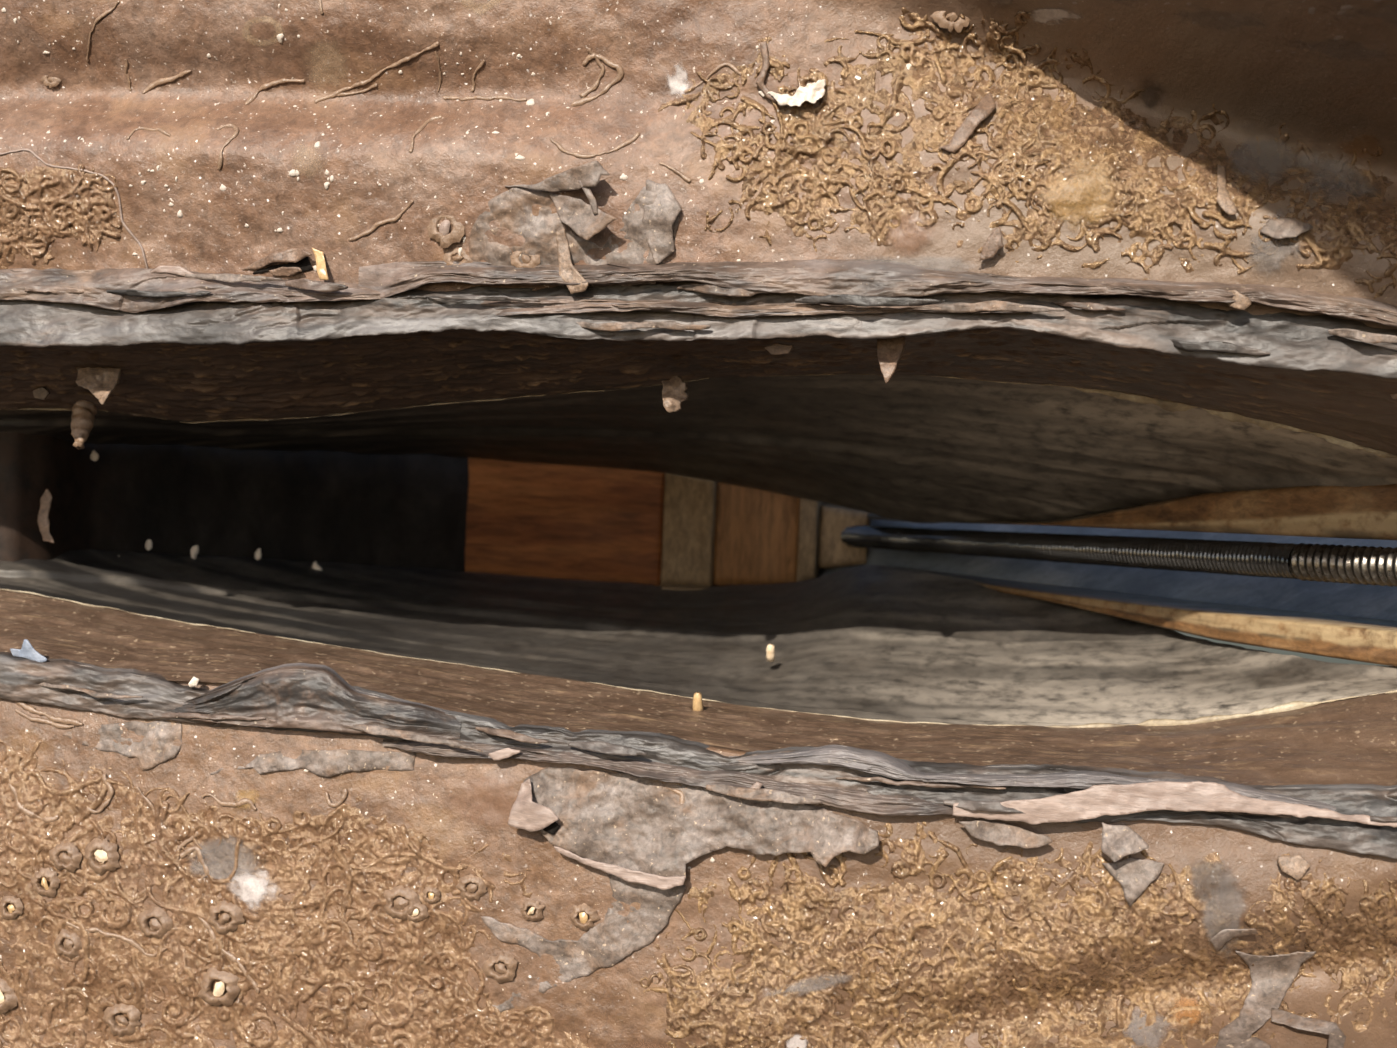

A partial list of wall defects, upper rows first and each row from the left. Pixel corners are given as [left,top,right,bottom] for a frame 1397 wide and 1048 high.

peeling [469,161,682,294]
peeling [480,767,879,994]
peeling [1210,929,1346,1048]